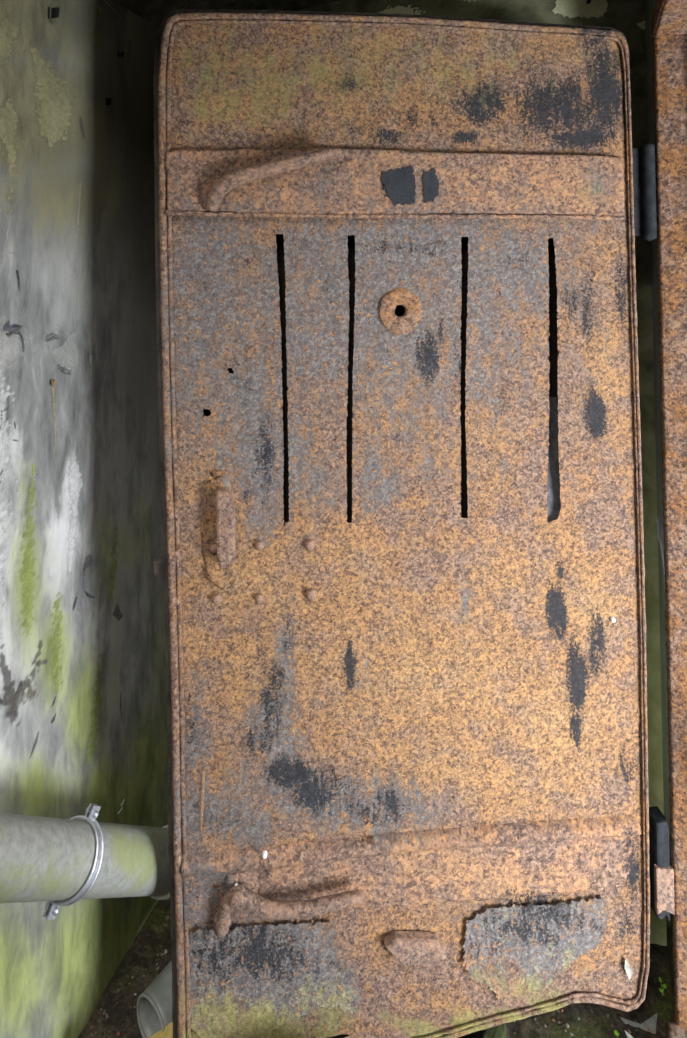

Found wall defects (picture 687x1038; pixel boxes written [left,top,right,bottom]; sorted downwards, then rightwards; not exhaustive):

peeling [552,0,608,18]
damp [0,641,47,725]